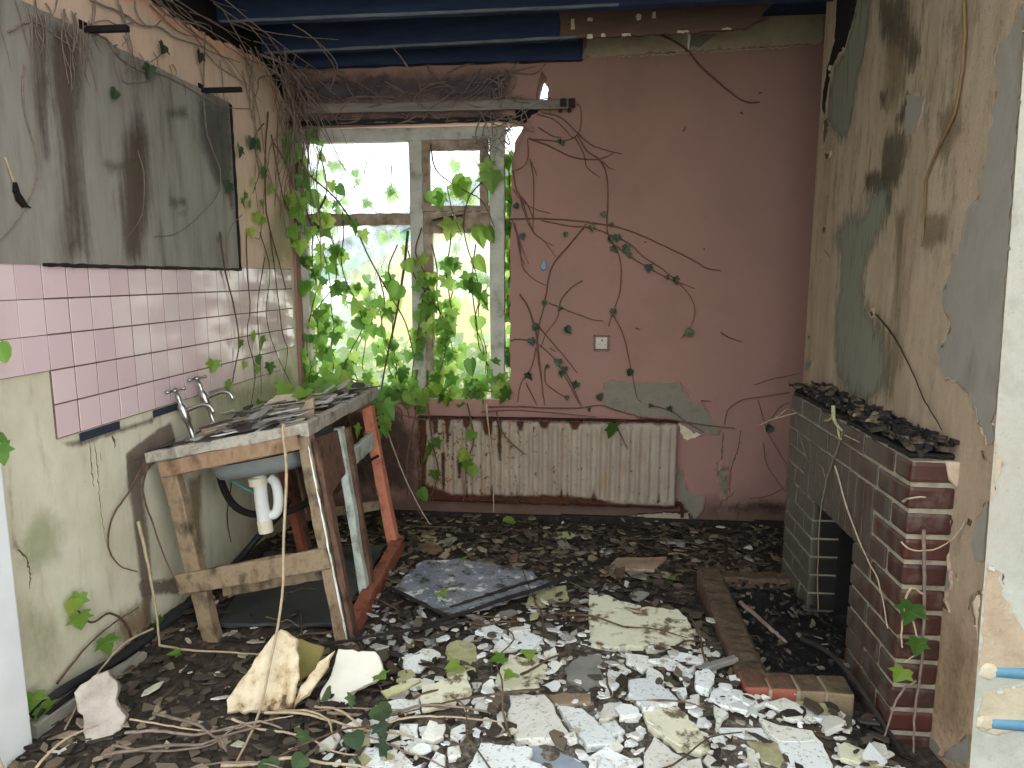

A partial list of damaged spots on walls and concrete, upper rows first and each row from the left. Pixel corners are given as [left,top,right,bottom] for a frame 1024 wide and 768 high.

peeling [582,0,872,161]
water stain [878,0,921,74]
water stain [865,94,909,214]
flaking render [937,2,1024,668]
flaking render [599,377,722,441]
flaking render [929,683,1024,768]